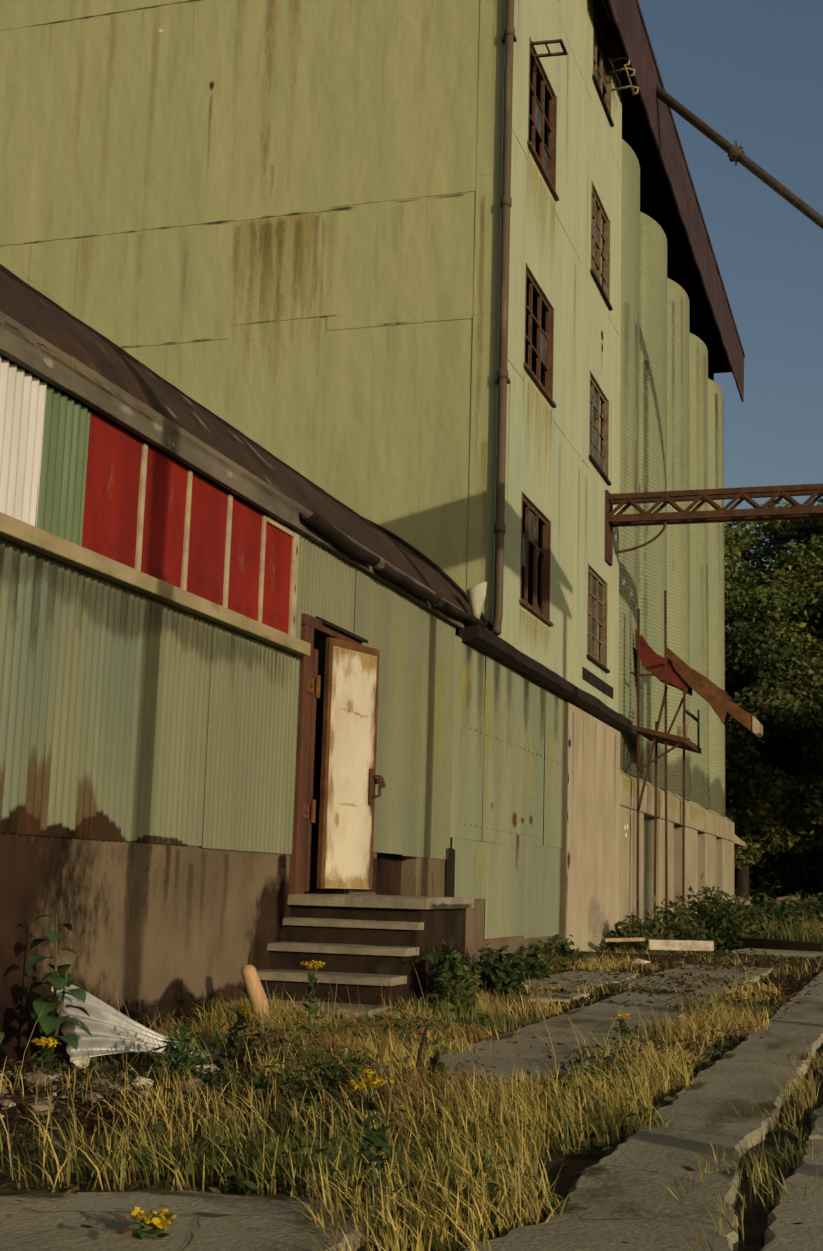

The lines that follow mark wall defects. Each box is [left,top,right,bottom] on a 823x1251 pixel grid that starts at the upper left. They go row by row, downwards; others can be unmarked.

rust [249,213,316,323]
rust [0,806,187,846]
damp [0,833,107,1064]
damp [71,954,248,1033]
damp [248,855,290,971]